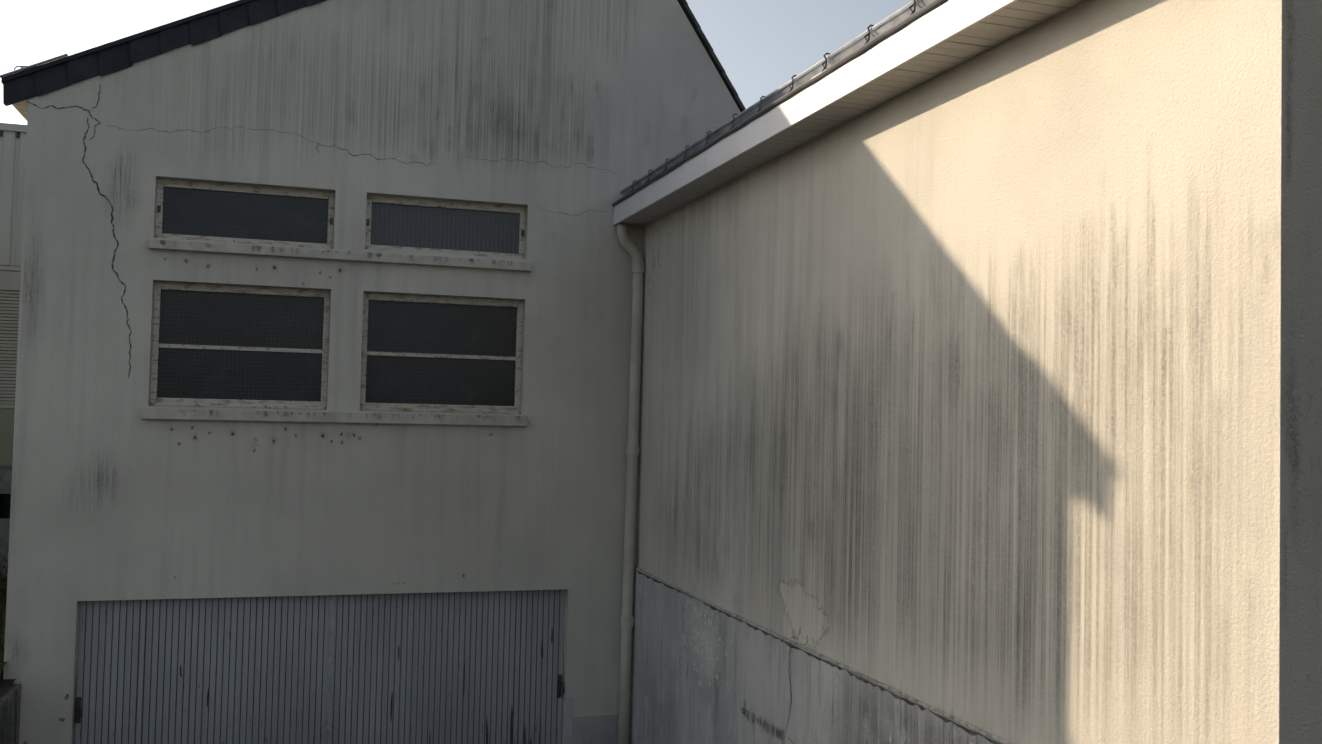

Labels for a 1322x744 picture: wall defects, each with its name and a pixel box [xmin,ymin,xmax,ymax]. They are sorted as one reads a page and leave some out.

crack [29,85,620,378]